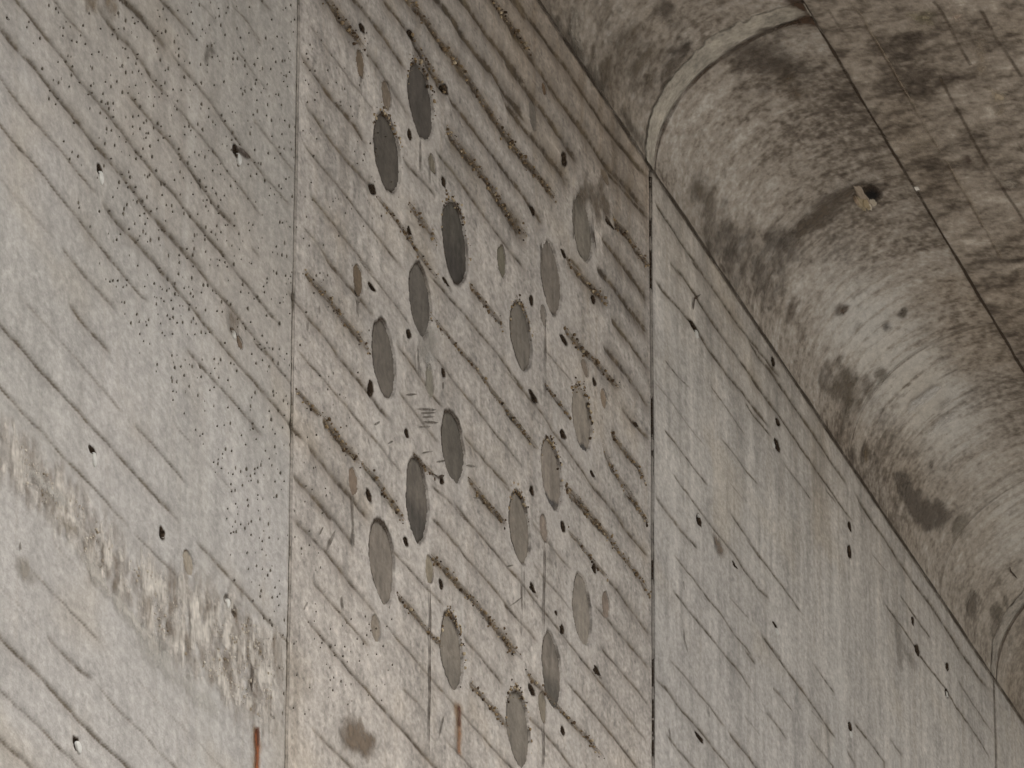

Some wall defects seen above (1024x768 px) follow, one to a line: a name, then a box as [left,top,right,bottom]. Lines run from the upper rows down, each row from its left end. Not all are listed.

leakage [787,0,817,28]
spalling [853,185,883,211]
leakage [709,184,880,307]
leakage [820,358,888,428]
leakage [896,472,962,533]
leakage [342,719,376,757]